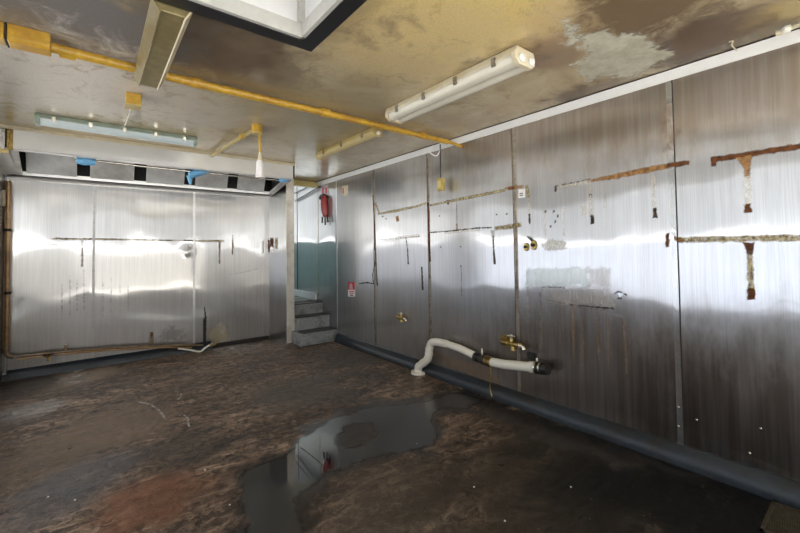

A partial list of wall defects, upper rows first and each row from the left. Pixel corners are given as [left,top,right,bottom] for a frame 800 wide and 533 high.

peeling [560,19,674,82]
corrosion [555,160,689,192]
corrosion [711,143,800,213]
corrosion [359,147,531,286]
corrosion [665,233,800,300]
leakage [228,385,717,533]